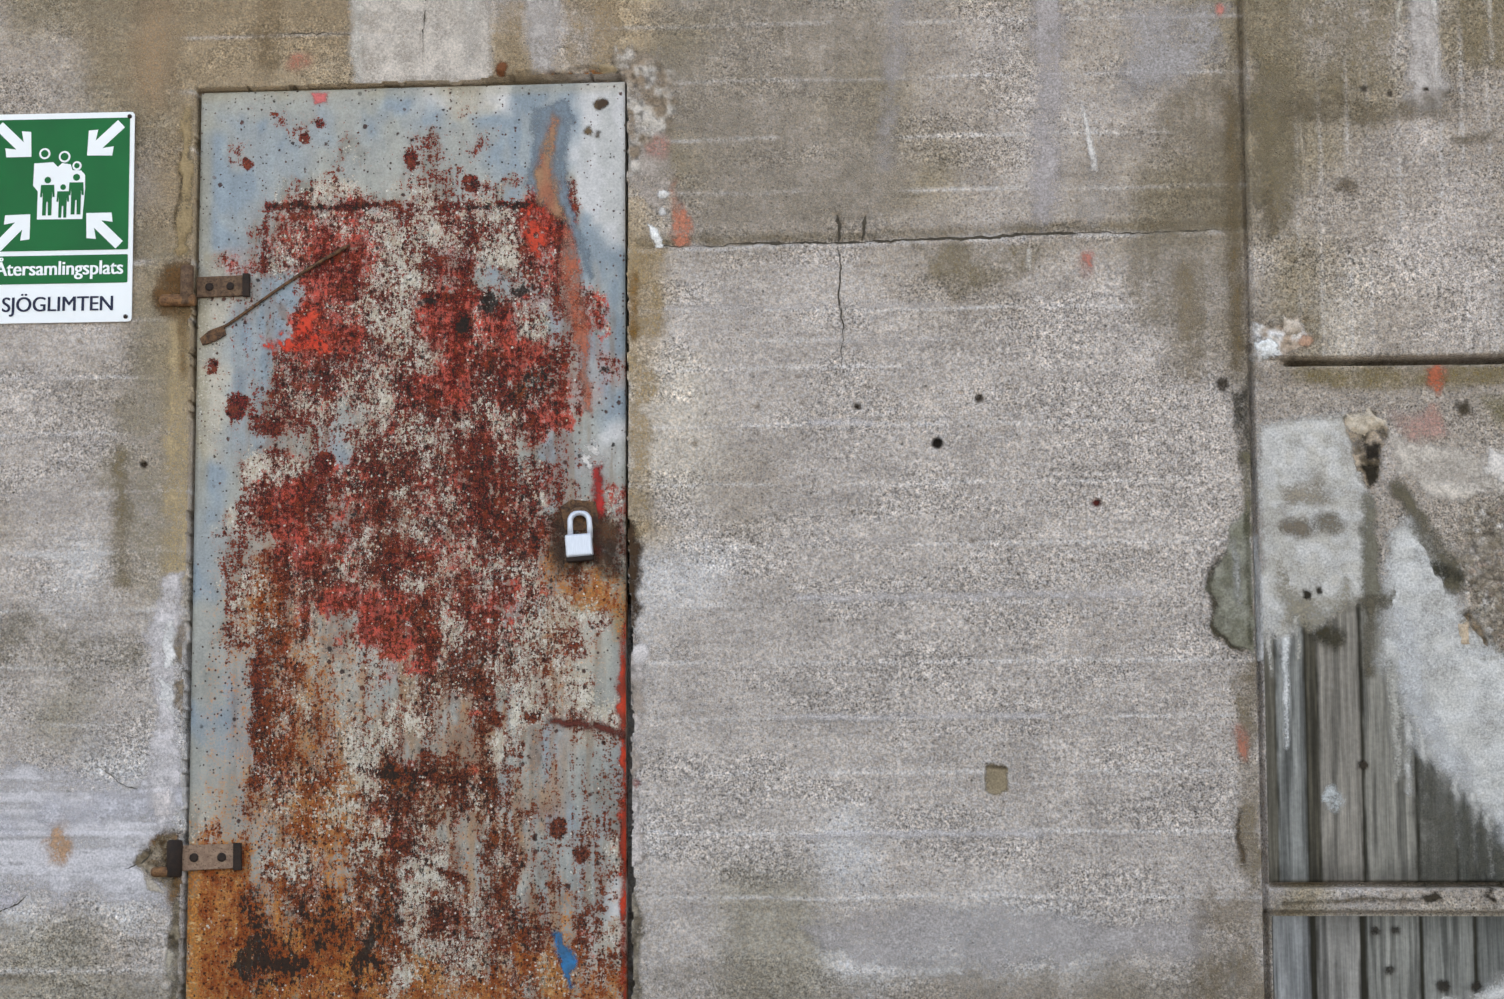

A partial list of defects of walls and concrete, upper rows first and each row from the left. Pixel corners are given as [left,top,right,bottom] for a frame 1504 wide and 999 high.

rust [593,98,609,110]
rust [535,116,592,412]
crack [643,215,1238,367]
water stain [1123,0,1449,758]
spalling [1343,408,1388,486]
spalling [1456,400,1471,416]
peeling [1437,448,1504,500]
peeling [1205,512,1256,654]
rust [550,718,626,739]
water stain [1358,493,1504,874]
water stain [0,764,183,908]
water stain [1235,777,1261,885]